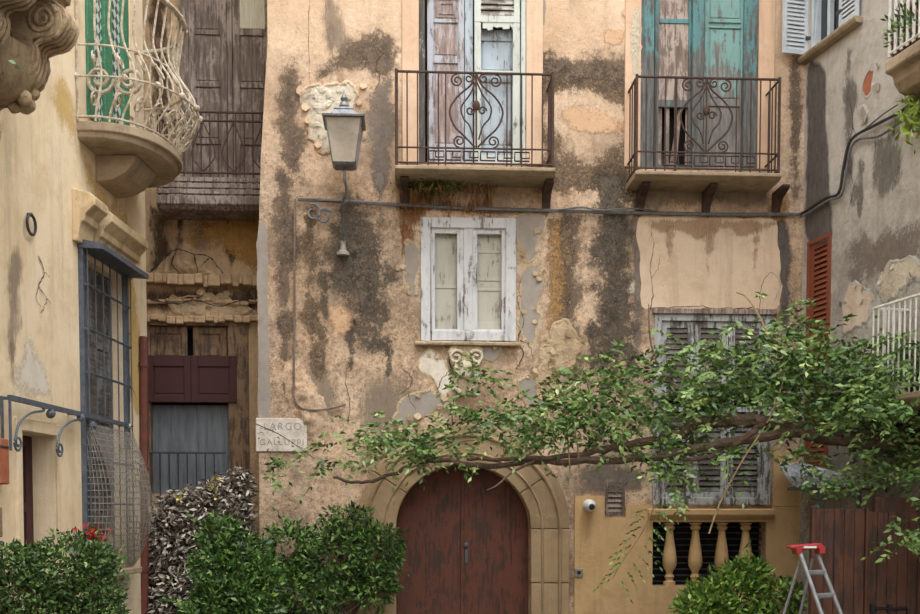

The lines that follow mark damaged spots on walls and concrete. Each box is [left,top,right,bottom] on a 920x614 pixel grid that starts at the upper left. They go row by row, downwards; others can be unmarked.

spalling [296,73,367,156]
damp [317,0,399,196]
damp [543,52,625,114]
damp [787,7,832,244]
crack [36,256,51,312]
crack [149,248,258,307]
damp [318,191,399,375]
flaking render [512,207,586,420]
damp [539,128,643,398]
damp [651,217,792,328]
flaking render [838,255,920,335]
flaking render [392,348,457,432]